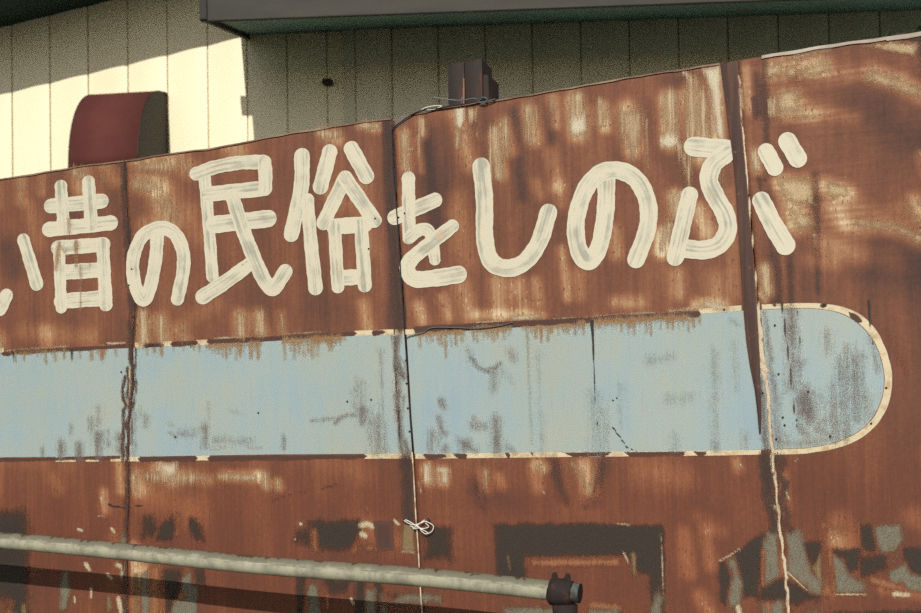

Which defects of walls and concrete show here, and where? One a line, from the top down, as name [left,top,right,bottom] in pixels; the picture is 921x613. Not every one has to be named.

peeling [738,75,763,185]
corrosion [0,116,701,543]
corrosion [757,252,882,536]
peeling [754,260,921,613]
corrosion [119,560,170,613]
peeling [348,518,415,556]
peeling [719,548,749,613]